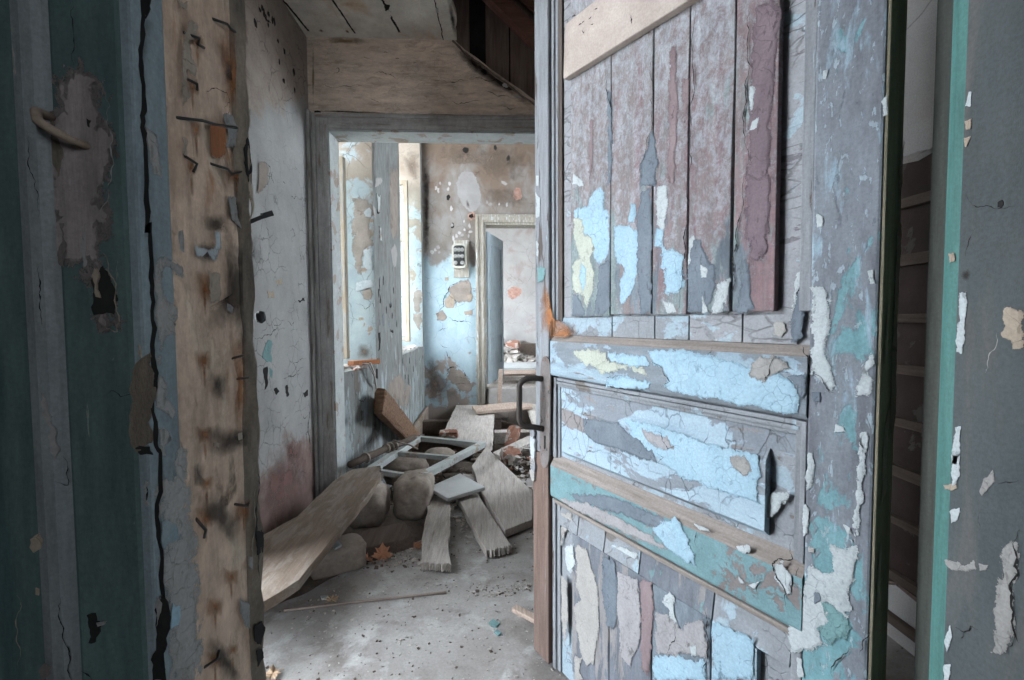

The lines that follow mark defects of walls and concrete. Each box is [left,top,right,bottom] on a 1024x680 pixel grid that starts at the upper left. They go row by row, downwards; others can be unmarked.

peeling [50,6,127,335]
peeling [572,0,782,318]
crack [106,0,171,680]
flaking render [351,166,420,407]
flaking render [436,277,473,321]
peeling [573,272,839,415]
peeling [1001,307,1024,349]
peeling [560,493,754,680]
peeling [583,418,790,518]
peeling [774,432,869,678]
peeling [943,426,961,491]
peeling [944,541,1020,655]